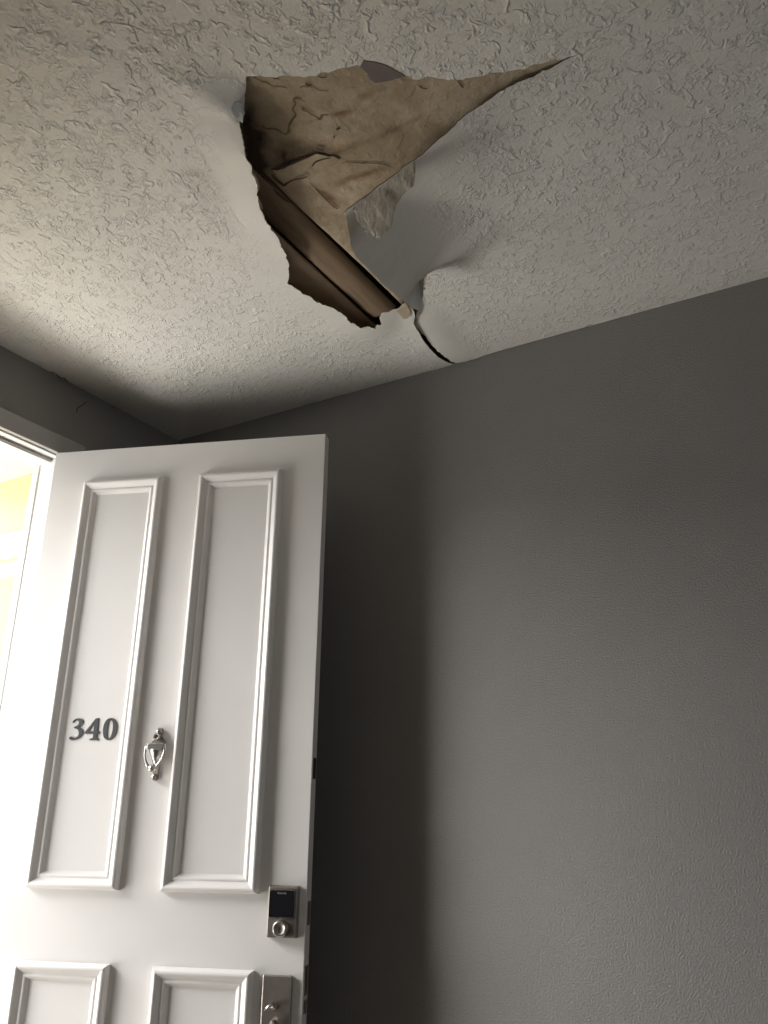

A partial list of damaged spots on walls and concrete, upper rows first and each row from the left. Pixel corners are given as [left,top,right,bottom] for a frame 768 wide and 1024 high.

peeling [360,60,406,83]
crack [414,319,453,363]